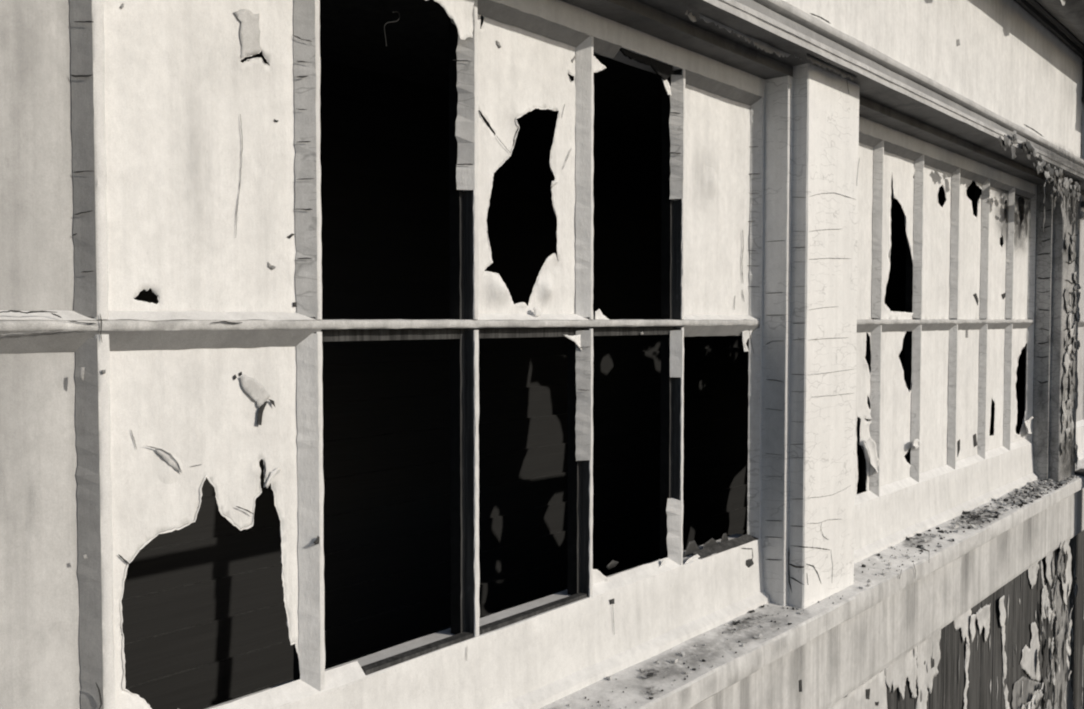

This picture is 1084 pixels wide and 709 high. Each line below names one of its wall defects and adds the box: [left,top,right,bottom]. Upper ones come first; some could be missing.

crack [235,114,243,230]
crack [734,221,851,353]
peeling [998,130,1083,469]
crack [766,369,852,477]
crack [741,485,851,593]
peeling [884,630,941,709]
peeling [952,540,1078,709]